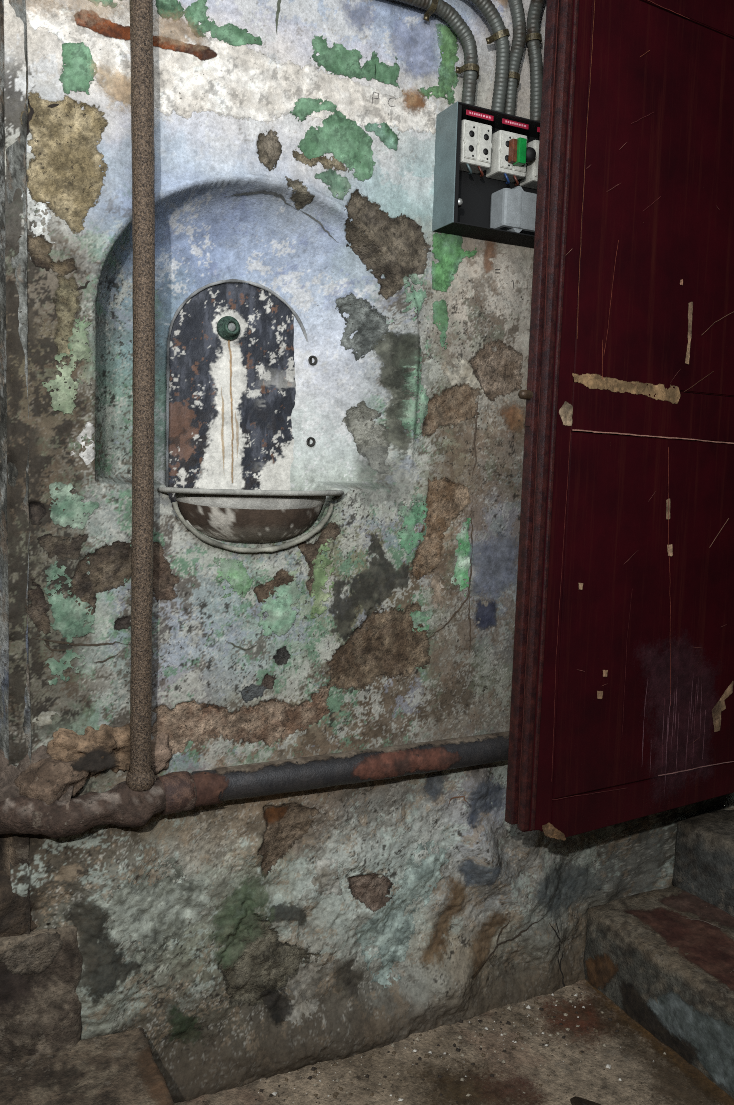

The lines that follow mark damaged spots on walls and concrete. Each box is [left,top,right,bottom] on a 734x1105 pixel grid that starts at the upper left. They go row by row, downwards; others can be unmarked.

rust [74,9,130,40]
rust [153,36,217,60]
peeling [155,0,262,46]
peeling [310,35,400,88]
flaking render [20,42,108,234]
flaking render [256,98,523,474]
water stain [385,332,421,419]
flaking render [151,521,433,755]
rust [192,772,229,807]
rust [264,807,287,822]
water stain [64,902,141,1004]
crack [468,916,565,988]